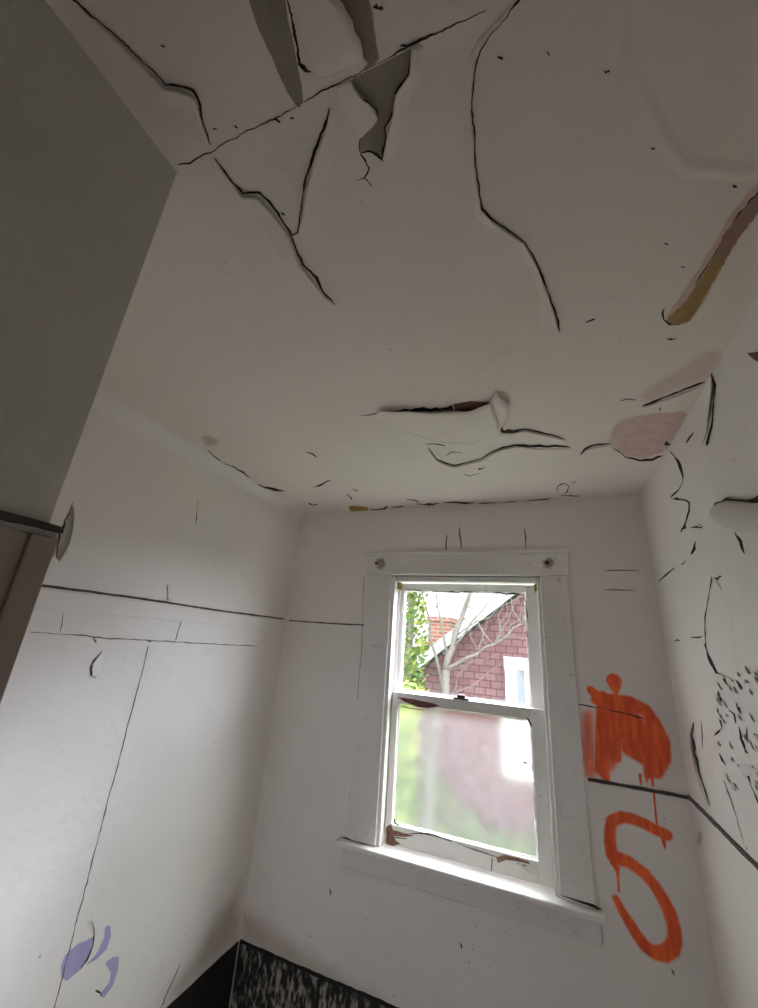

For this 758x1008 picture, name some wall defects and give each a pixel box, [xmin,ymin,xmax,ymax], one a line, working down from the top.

peeling [245,0,312,123]
peeling [336,0,423,163]
crack [65,0,560,333]
flaking render [661,178,758,328]
peeling [362,391,515,444]
crack [426,428,612,476]
peeling [604,408,690,462]
crack [621,373,716,581]
crack [735,532,745,554]
crack [675,636,728,686]
peeling [385,823,414,846]
crack [686,722,748,851]